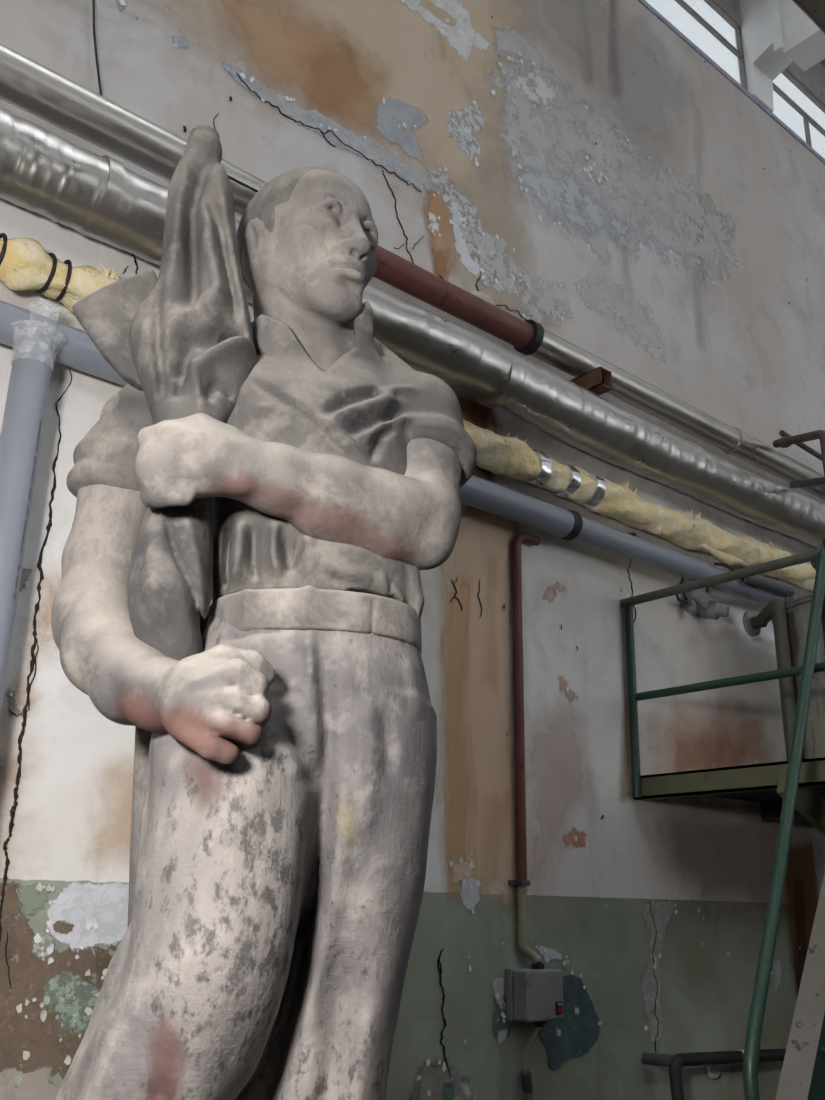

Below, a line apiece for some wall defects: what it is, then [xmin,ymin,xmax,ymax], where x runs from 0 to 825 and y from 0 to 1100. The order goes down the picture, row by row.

damp [173,0,540,312]
peeling [223,63,574,326]
peeling [401,0,738,284]
crack [0,367,72,989]
peeling [449,853,481,914]
spalling [562,828,586,848]
peeling [0,881,129,1100]
peeling [411,1059,473,1100]
crack [437,948,451,1079]
peeling [492,977,511,1046]
peeling [531,935,602,1070]
peeling [641,897,682,1043]